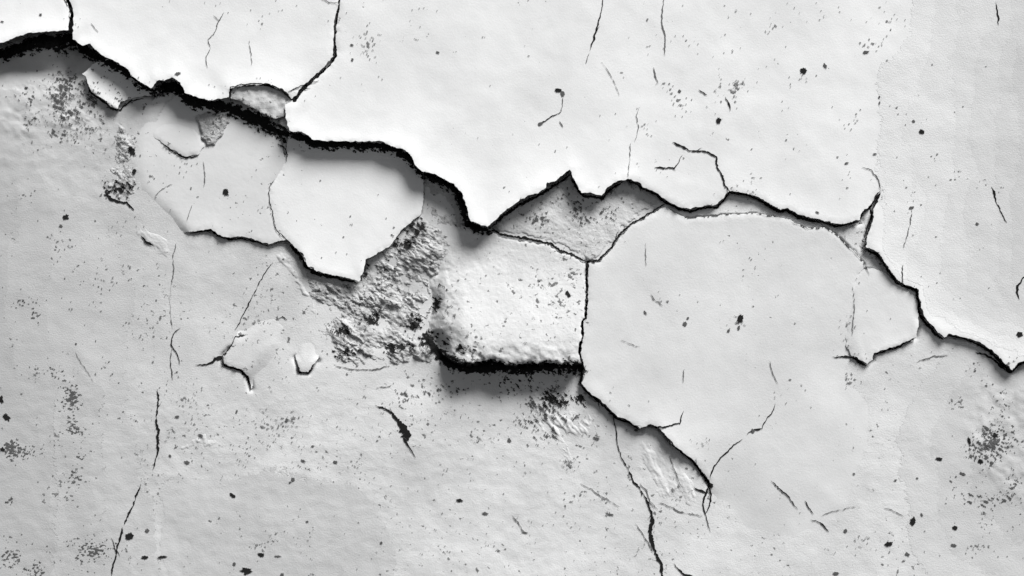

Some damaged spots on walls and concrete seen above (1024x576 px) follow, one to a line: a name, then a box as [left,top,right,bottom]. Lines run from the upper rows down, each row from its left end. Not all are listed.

spalling [0,71,96,134]
crack [111,182,359,576]
flaking render [216,319,284,389]
flaking render [69,0,1024,372]
crack [290,131,881,576]
flaking render [496,176,919,537]